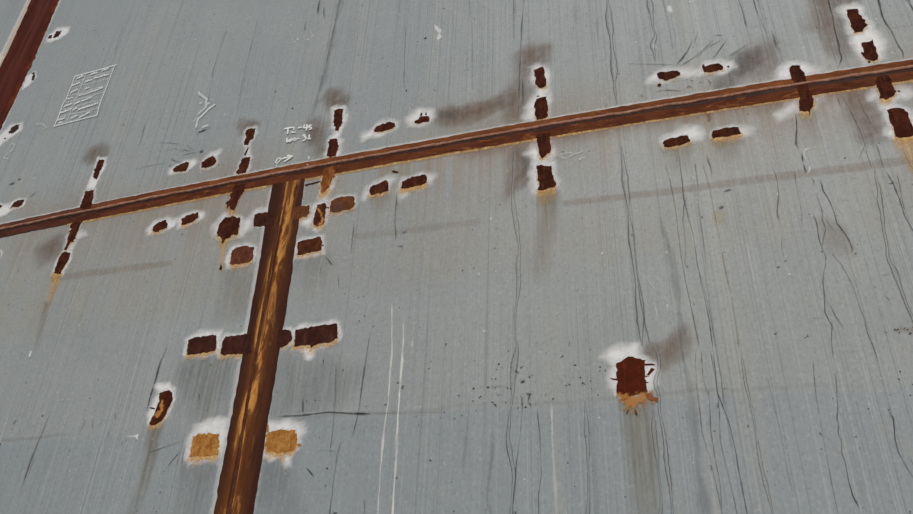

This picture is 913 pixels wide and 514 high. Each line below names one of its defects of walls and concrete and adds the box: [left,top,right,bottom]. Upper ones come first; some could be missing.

rust [0,83,824,514]
rust [0,0,913,228]